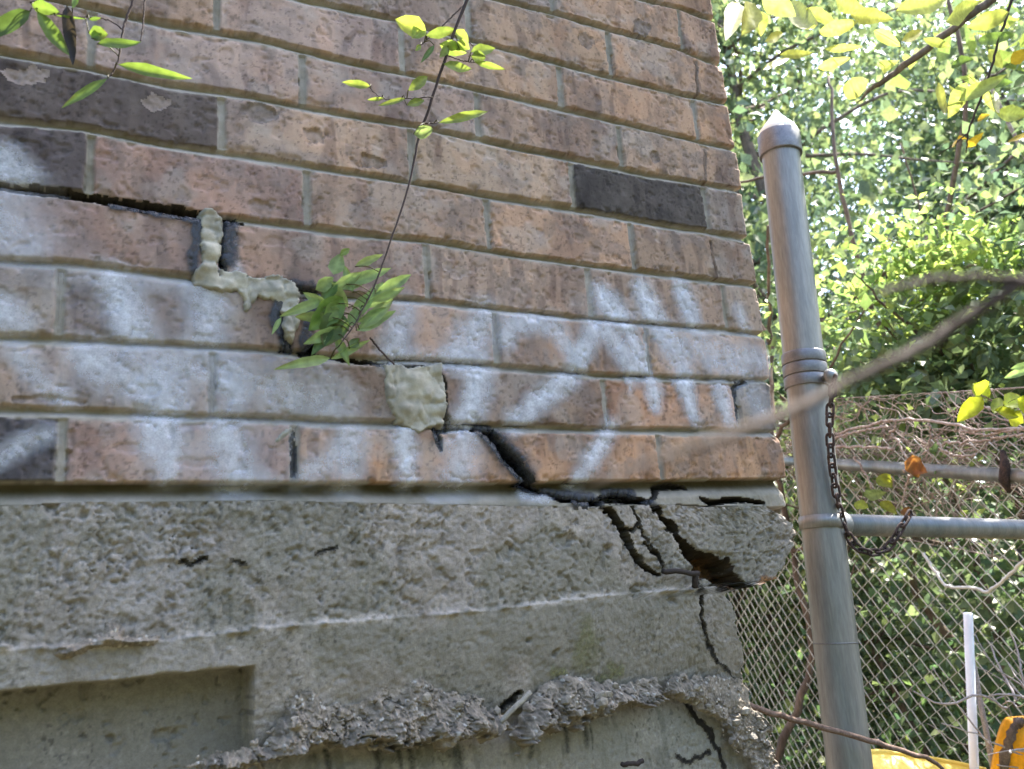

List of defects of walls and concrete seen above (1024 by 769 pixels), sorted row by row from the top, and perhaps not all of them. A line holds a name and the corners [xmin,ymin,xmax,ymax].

crack [0,182,244,226]
crack [297,347,562,503]
crack [598,483,765,576]
crack [695,580,735,679]
spalling [186,672,784,769]
crack [498,689,524,713]
crack [675,702,727,769]